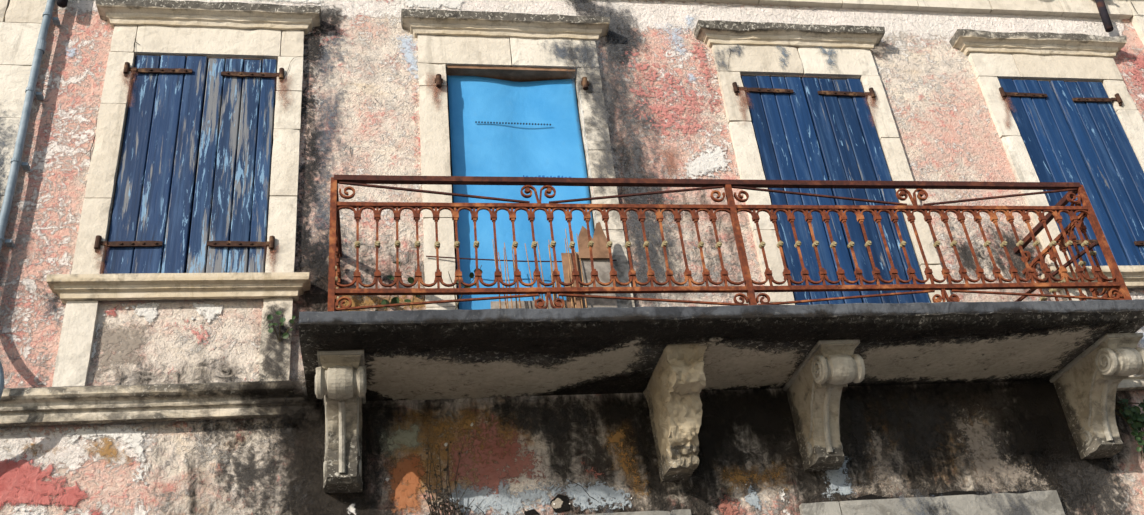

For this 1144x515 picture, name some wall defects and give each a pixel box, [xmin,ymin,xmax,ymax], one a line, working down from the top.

water stain [0,111,16,195]
water stain [294,5,347,286]
water stain [545,0,682,304]
water stain [953,226,1043,283]
peeling [91,302,160,375]
peeling [175,301,223,345]
rust [343,295,426,311]
peeling [0,443,102,515]
peeling [54,424,150,485]
peeling [365,338,647,515]
water stain [178,305,1138,515]